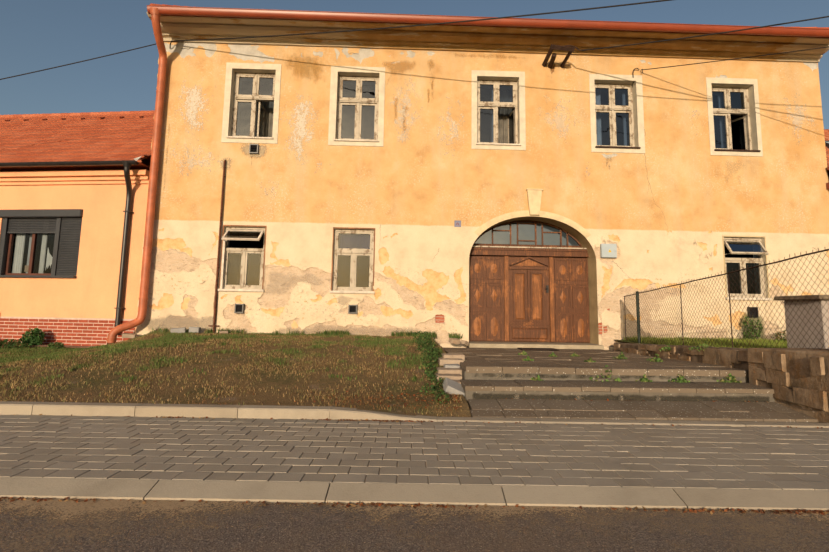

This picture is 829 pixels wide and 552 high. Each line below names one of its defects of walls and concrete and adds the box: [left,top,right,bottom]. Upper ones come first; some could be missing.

crack [644,153,713,276]
flaking render [150,228,221,276]
flaking render [148,293,200,332]
flaking render [220,232,469,346]
flaking render [593,234,746,348]
flaking render [762,320,781,340]
flaking render [769,278,829,307]